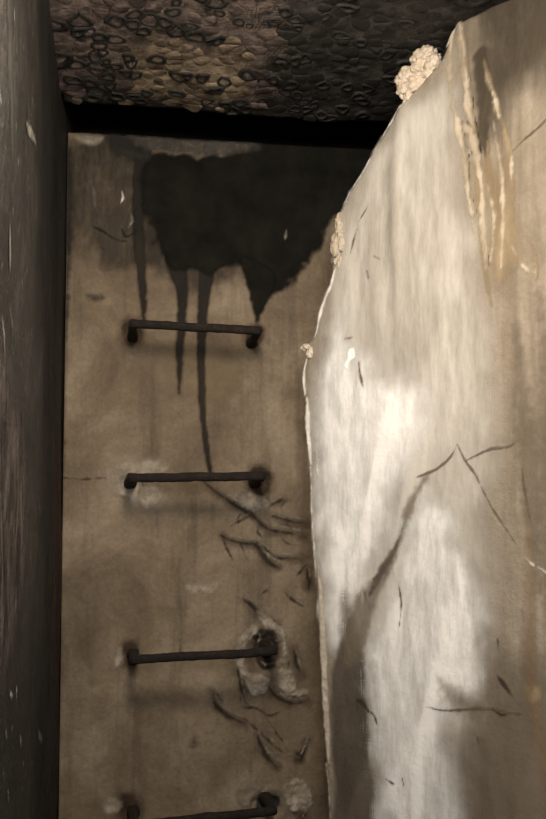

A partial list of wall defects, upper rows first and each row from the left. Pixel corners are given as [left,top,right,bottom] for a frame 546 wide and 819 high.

leakage [457,23,472,124]
leakage [473,0,546,156]
crack [216,492,311,606]
leakage [68,88,546,819]
spalling [300,344,318,476]
crack [419,443,514,541]
crack [214,590,301,760]
spalling [237,613,308,697]
spalling [315,565,330,762]